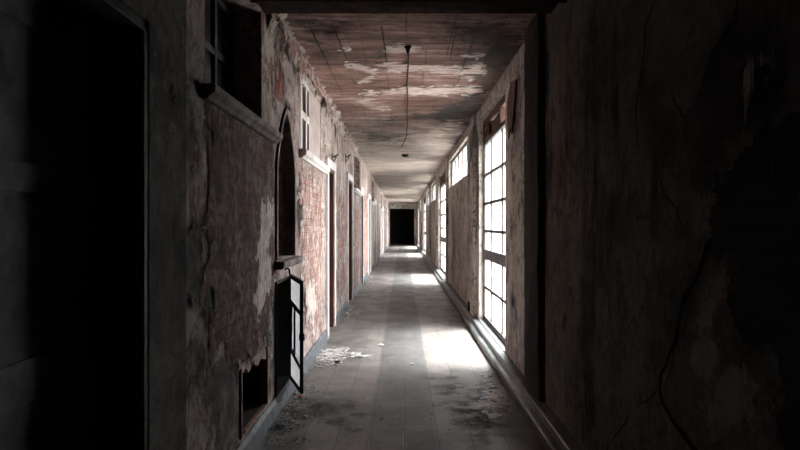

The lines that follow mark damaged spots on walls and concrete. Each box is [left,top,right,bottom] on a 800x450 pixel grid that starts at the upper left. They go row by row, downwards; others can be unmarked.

peeling [337,43,489,111]
flaking render [199,101,276,369]
flaking render [296,162,324,340]
crack [607,238,713,450]